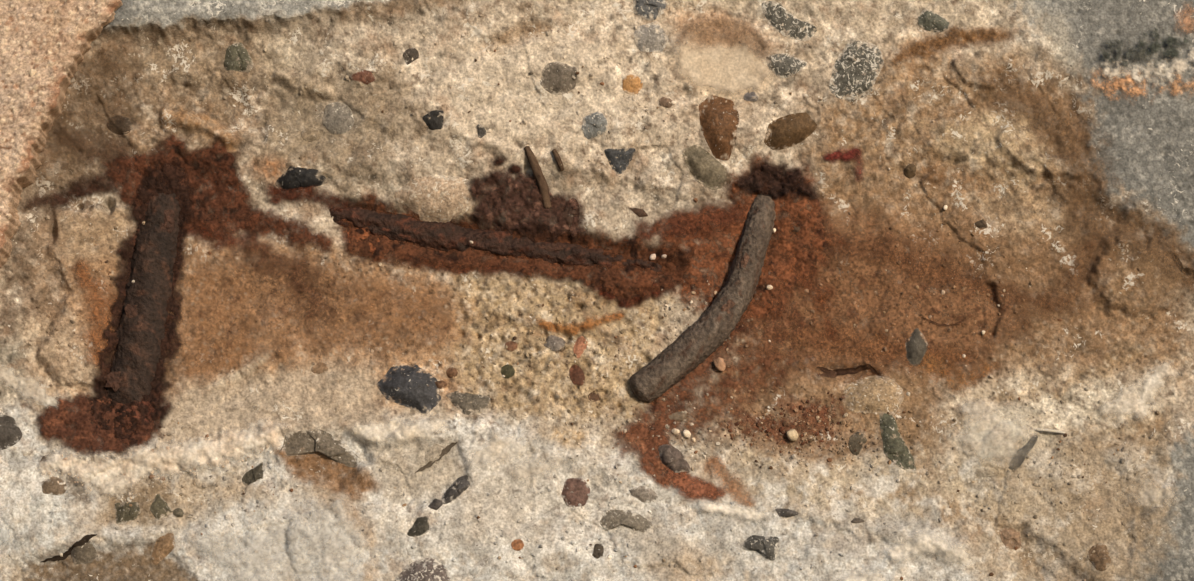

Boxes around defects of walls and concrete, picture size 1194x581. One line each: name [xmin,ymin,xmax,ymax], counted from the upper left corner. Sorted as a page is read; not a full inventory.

rust [894,28,1005,63]
spalling [642,234,670,249]
rust [26,130,1051,505]
spalling [720,315,772,381]